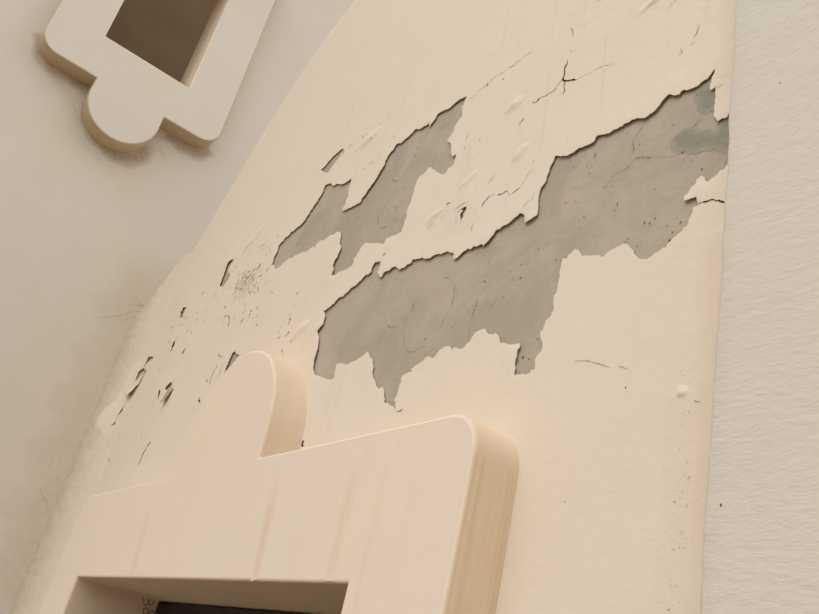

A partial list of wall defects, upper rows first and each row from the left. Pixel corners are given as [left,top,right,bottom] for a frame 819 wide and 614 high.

crack [522,61,611,120]
peeling [260,97,466,276]
peeling [313,70,729,409]
peeling [124,357,153,397]